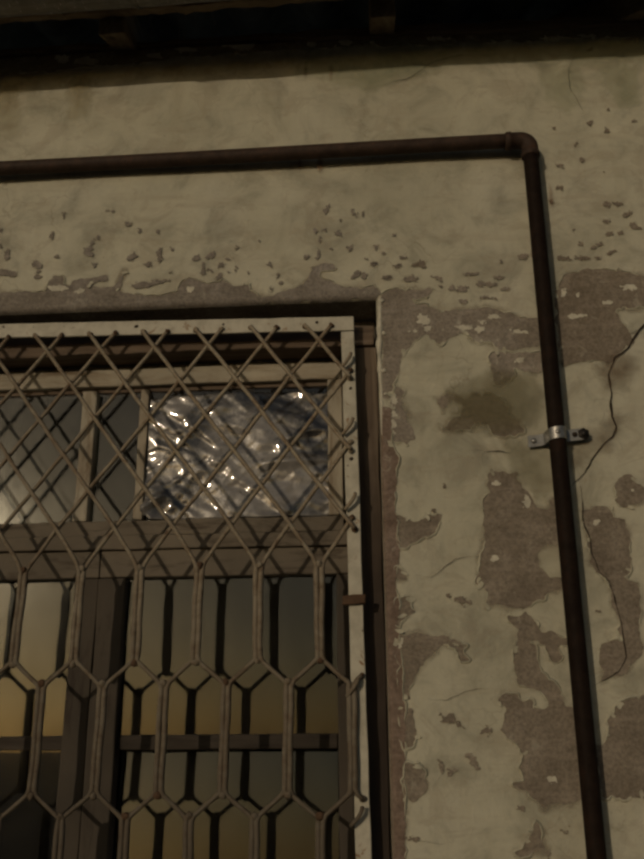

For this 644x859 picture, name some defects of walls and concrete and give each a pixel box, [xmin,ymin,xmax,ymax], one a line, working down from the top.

peeling [552,201,644,366]
peeling [0,209,542,859]
peeling [473,468,581,812]
crack [573,324,644,686]
peeling [581,474,644,680]
peeling [512,819,552,859]
peeling [596,695,644,803]